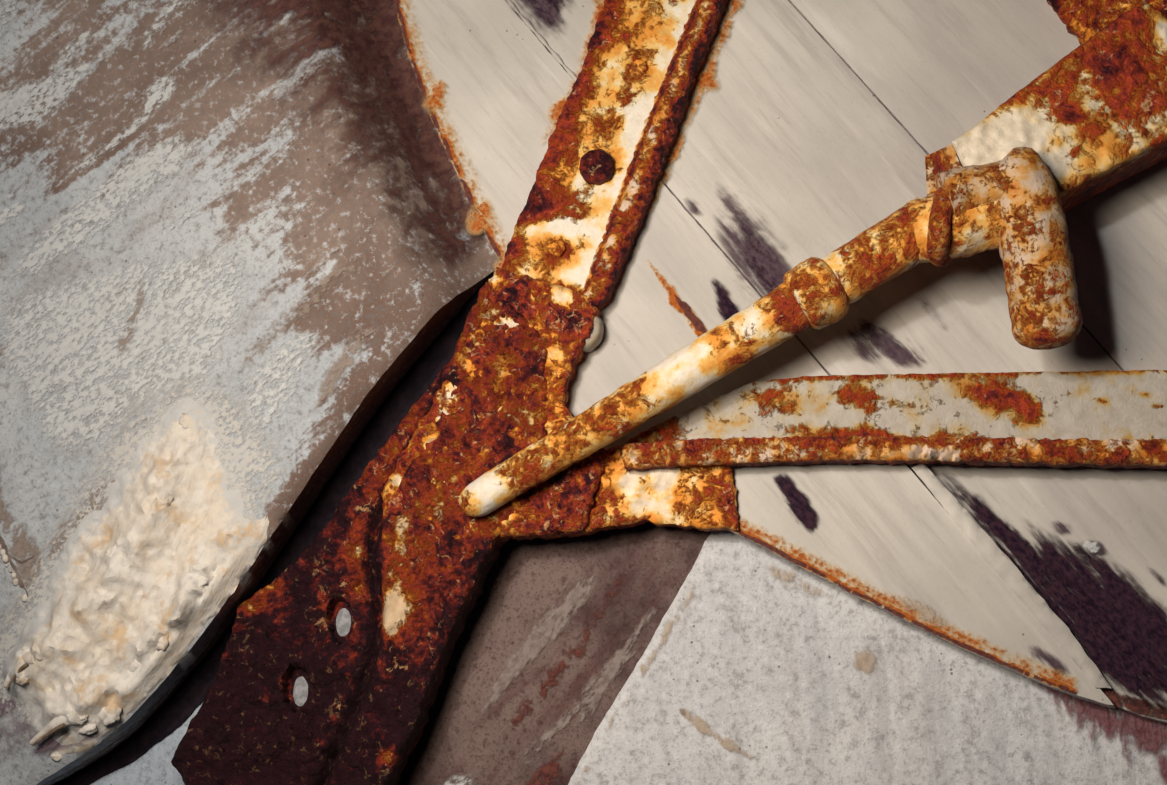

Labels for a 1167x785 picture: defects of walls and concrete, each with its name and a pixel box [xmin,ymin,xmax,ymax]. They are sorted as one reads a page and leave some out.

corrosion [394,0,507,268]
corrosion [546,82,575,136]
corrosion [580,0,604,67]
corrosion [649,0,742,206]
corrosion [649,262,707,337]
crack [0,535,37,602]
damp [0,378,280,753]
corrosion [511,580,619,728]
corrosion [640,621,674,673]
corrosion [732,519,1167,784]
damp [945,476,1167,710]